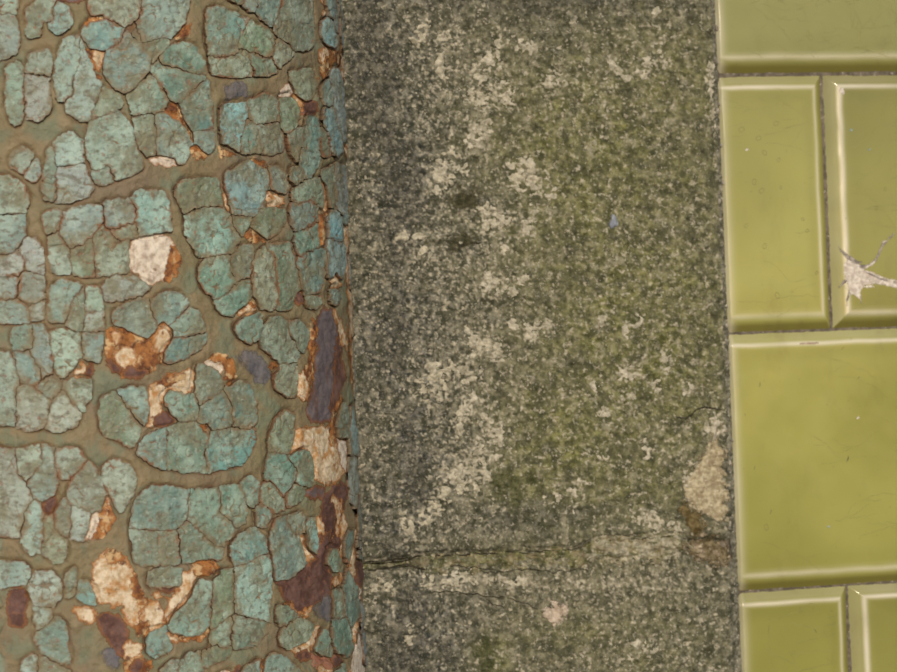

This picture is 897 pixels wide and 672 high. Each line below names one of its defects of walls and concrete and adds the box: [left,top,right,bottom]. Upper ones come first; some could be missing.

peeling [838,233,897,304]
corrosion [73,361,95,379]
corrosion [104,323,195,429]
peeling [0,0,367,672]
corrosion [204,352,238,386]
spalling [681,424,731,569]
corrosion [71,548,166,672]
crack [366,535,687,609]